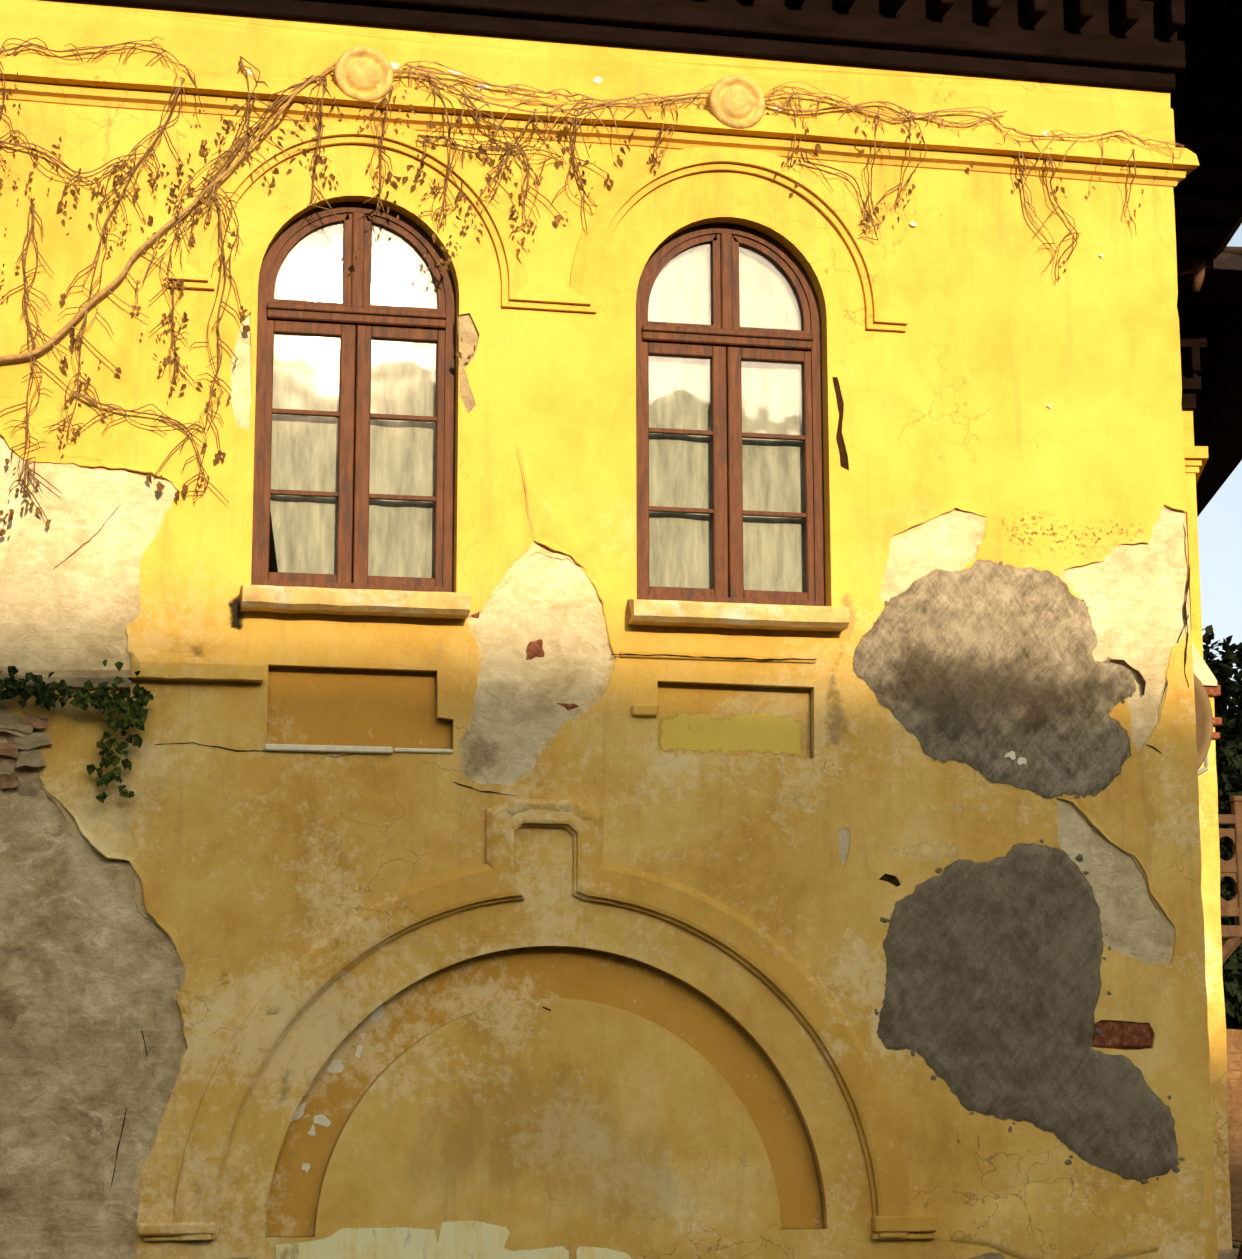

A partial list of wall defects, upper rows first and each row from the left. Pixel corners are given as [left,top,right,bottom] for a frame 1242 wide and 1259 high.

spalling [231,313,251,431]
spalling [458,314,479,413]
spalling [0,420,181,671]
spalling [878,503,988,603]
spalling [459,539,616,786]
spalling [1059,503,1191,752]
crack [155,742,356,758]
peeling [1005,751,1027,765]
spalling [879,874,900,887]
spalling [1056,797,1176,966]
spalling [0,700,188,1259]
spalling [1093,1020,1153,1050]